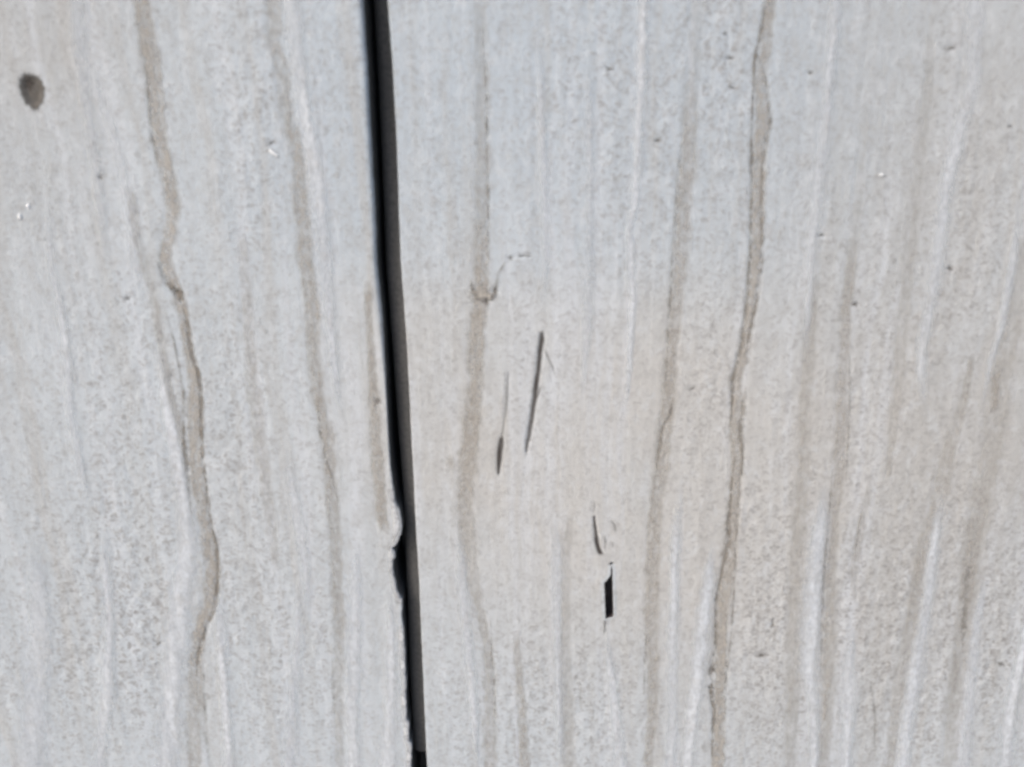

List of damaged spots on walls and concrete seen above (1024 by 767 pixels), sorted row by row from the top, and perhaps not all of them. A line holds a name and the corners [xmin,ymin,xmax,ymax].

crack [497,333,544,474]
crack [593,517,602,554]